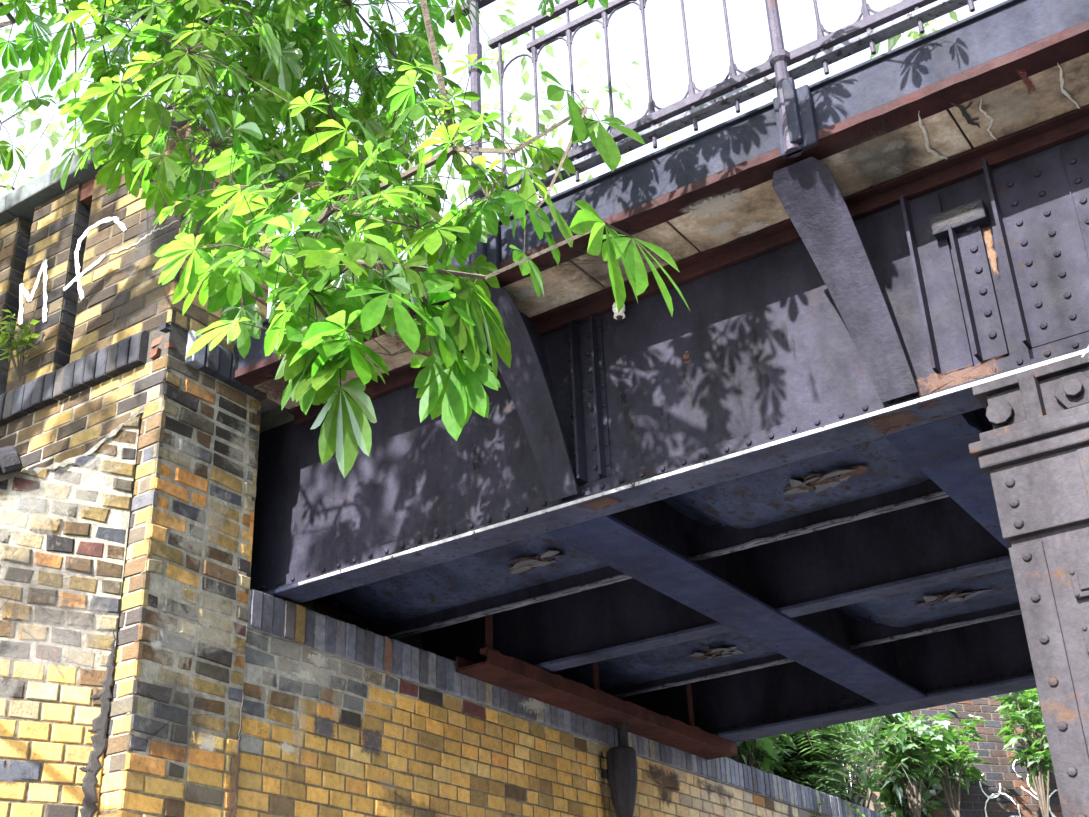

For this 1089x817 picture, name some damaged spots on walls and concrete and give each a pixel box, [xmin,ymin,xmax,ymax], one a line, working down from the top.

crack [1058,64,1080,109]
crack [918,113,947,159]
crack [950,100,997,140]